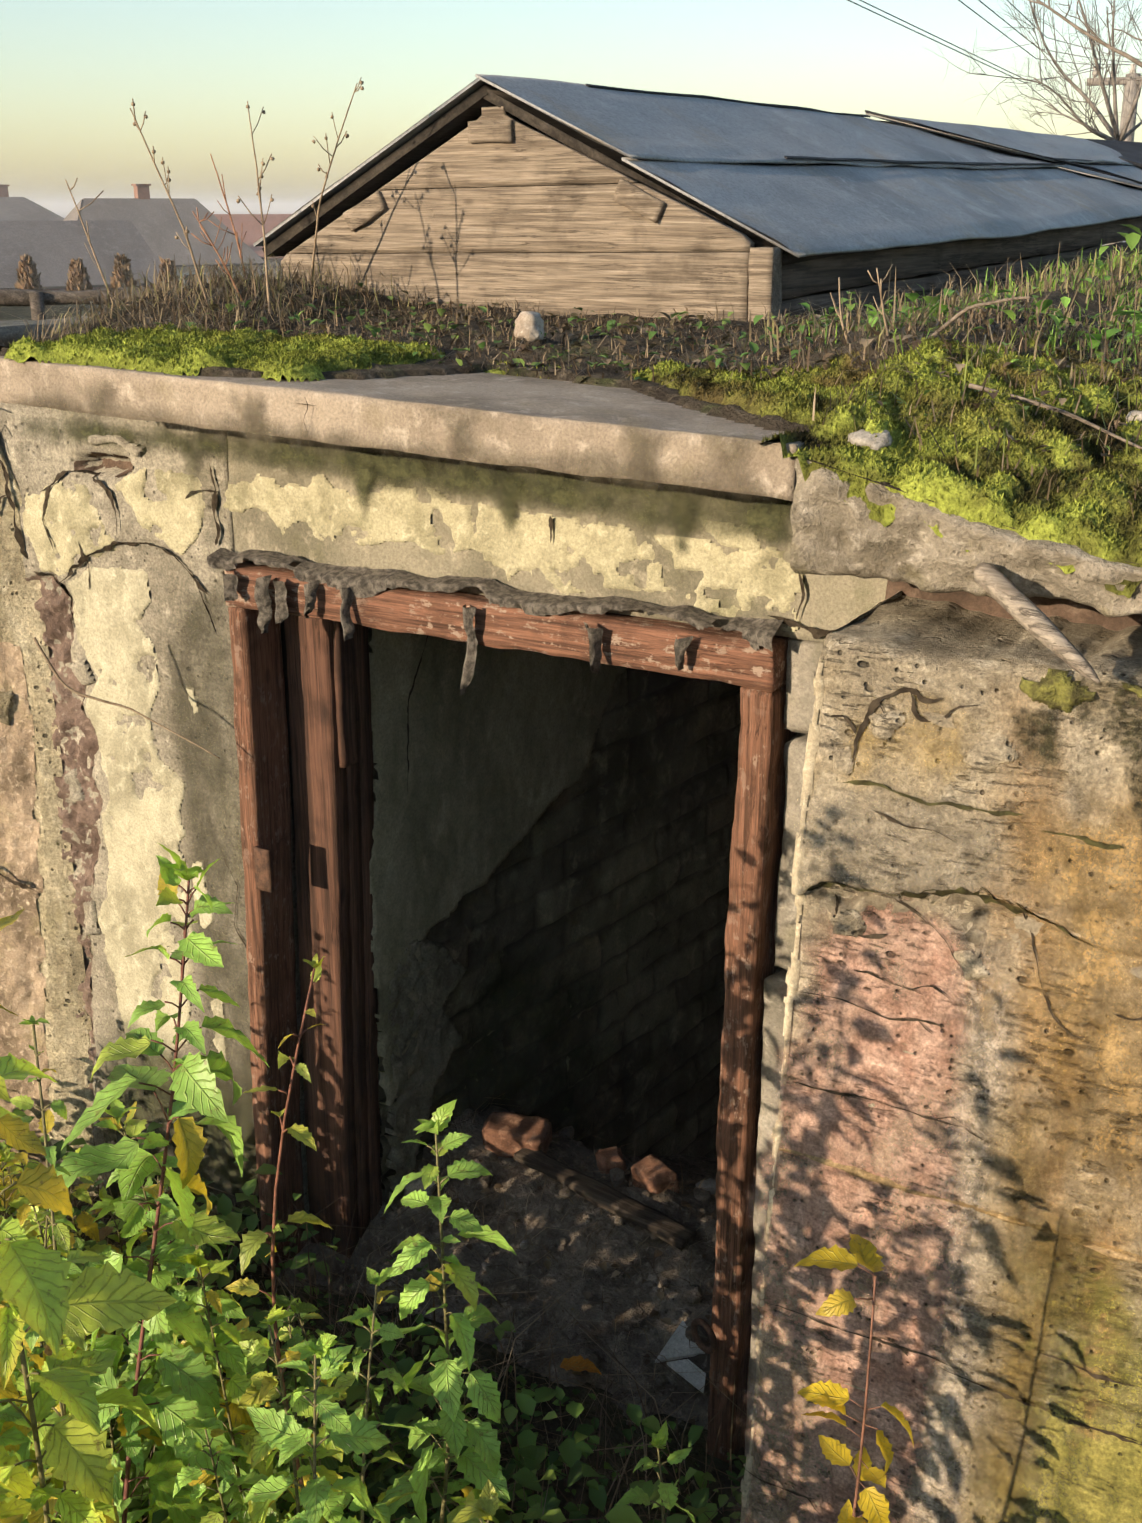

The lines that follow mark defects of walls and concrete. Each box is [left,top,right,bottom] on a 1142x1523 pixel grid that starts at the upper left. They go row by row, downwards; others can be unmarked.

crack [0,460,221,632]
damp [354,463,374,507]
damp [500,477,521,525]
damp [581,428,656,485]
peeling [0,435,806,1207]
crack [829,687,1124,850]
crack [802,881,1142,1038]
damp [1048,830,1142,1185]
damp [1051,1230,1067,1283]